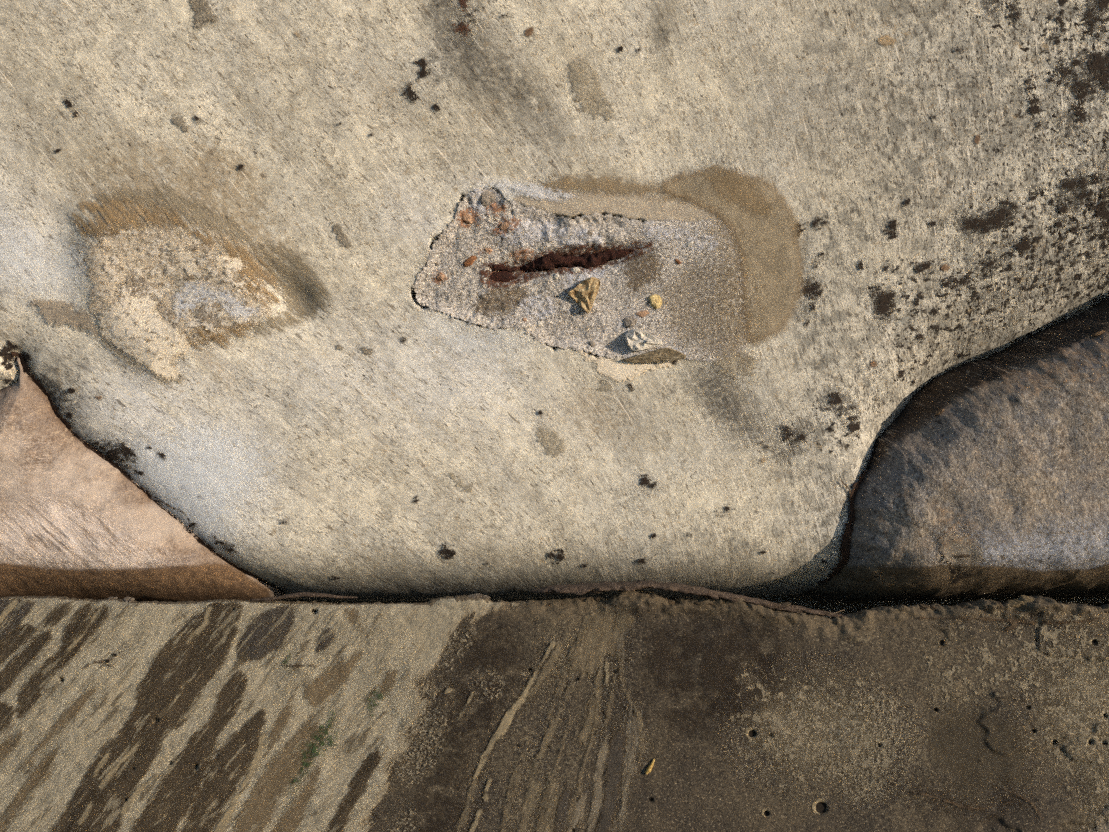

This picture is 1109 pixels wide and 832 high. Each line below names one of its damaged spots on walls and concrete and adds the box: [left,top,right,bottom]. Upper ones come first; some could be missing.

spalling [411,188,748,391]
leakage [492,165,828,380]
leakage [89,427,271,552]
leakage [379,669,398,695]
leakage [417,608,645,832]
leakage [643,615,783,737]
leakage [326,750,381,832]